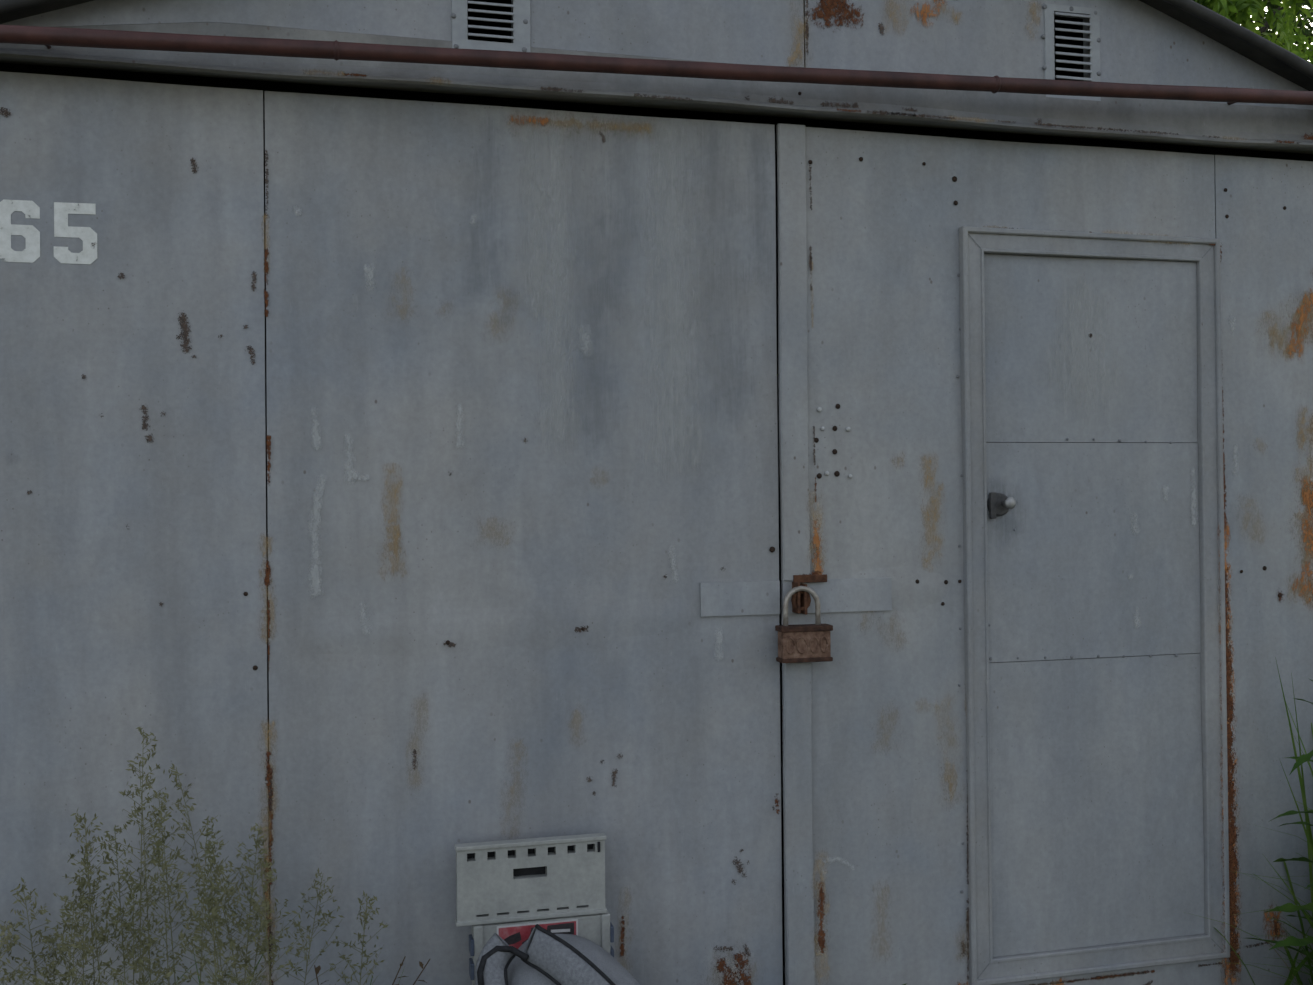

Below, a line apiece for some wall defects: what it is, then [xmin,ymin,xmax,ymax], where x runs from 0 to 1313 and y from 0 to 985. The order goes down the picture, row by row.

corrosion [791,0,896,62]
corrosion [1270,293,1313,357]
corrosion [800,426,823,575]
corrosion [1278,464,1313,602]
corrosion [263,538,272,668]
corrosion [1198,378,1241,985]
corrosion [263,724,275,985]
corrosion [714,944,751,985]
corrosion [816,862,828,968]
corrosion [959,781,970,985]
corrosion [1029,970,1155,985]